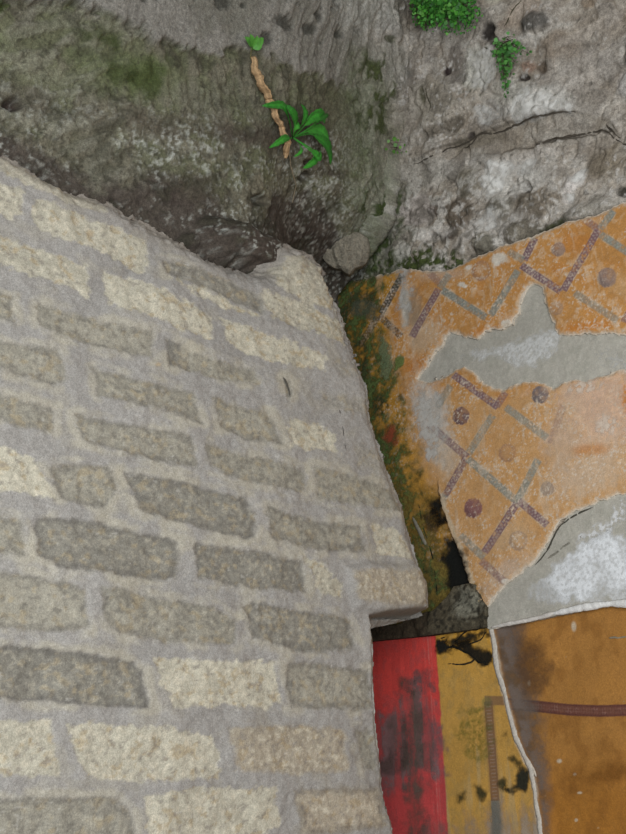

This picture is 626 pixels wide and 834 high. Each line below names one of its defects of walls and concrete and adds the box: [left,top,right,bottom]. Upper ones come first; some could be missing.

crack [415,111,575,164]
crack [537,124,626,145]
leakage [379,339,404,380]
spalling [419,285,626,434]
flaking render [414,393,445,461]
leakage [379,675,442,801]
leakage [496,625,548,826]
spalling [487,494,626,834]